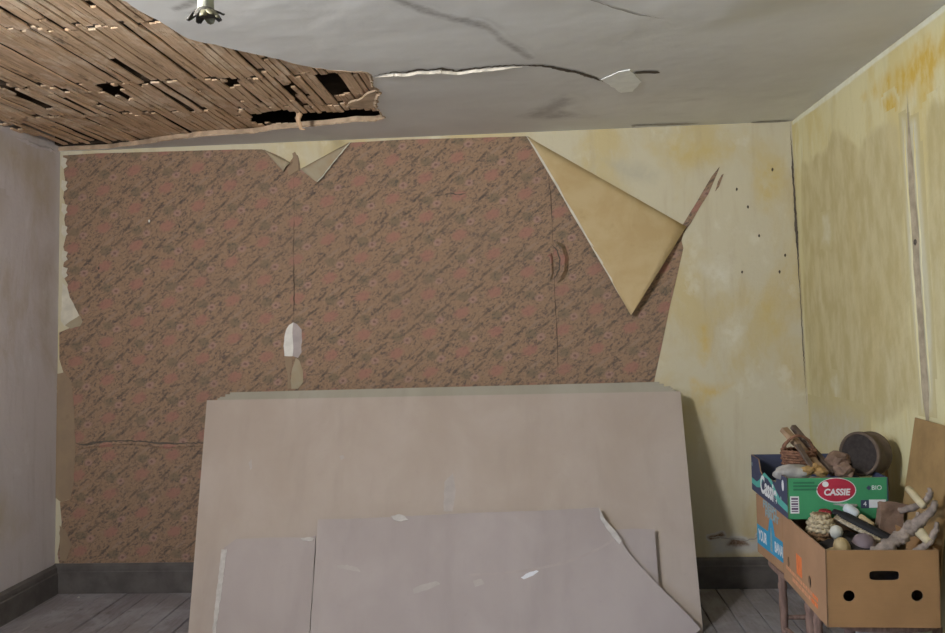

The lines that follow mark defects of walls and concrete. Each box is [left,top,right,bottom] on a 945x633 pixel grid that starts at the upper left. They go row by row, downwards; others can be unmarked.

flaking render [0,0,386,148]
crack [372,65,603,82]
crack [635,68,660,76]
damp [854,14,945,117]
peeling [301,142,350,182]
peeling [527,137,686,315]
peeling [799,107,921,432]